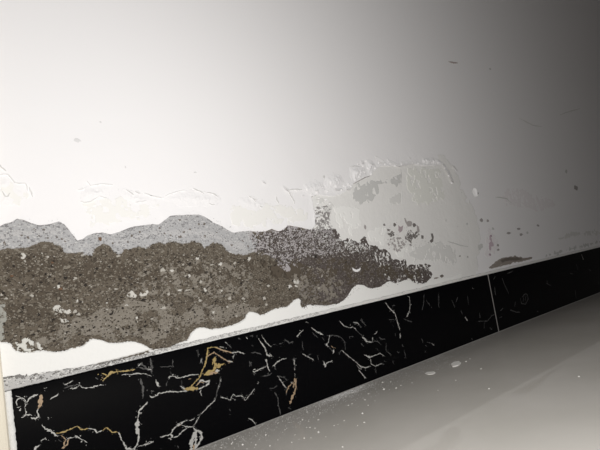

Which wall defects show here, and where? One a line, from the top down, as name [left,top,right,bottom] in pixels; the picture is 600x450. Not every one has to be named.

peeling [0,155,481,365]